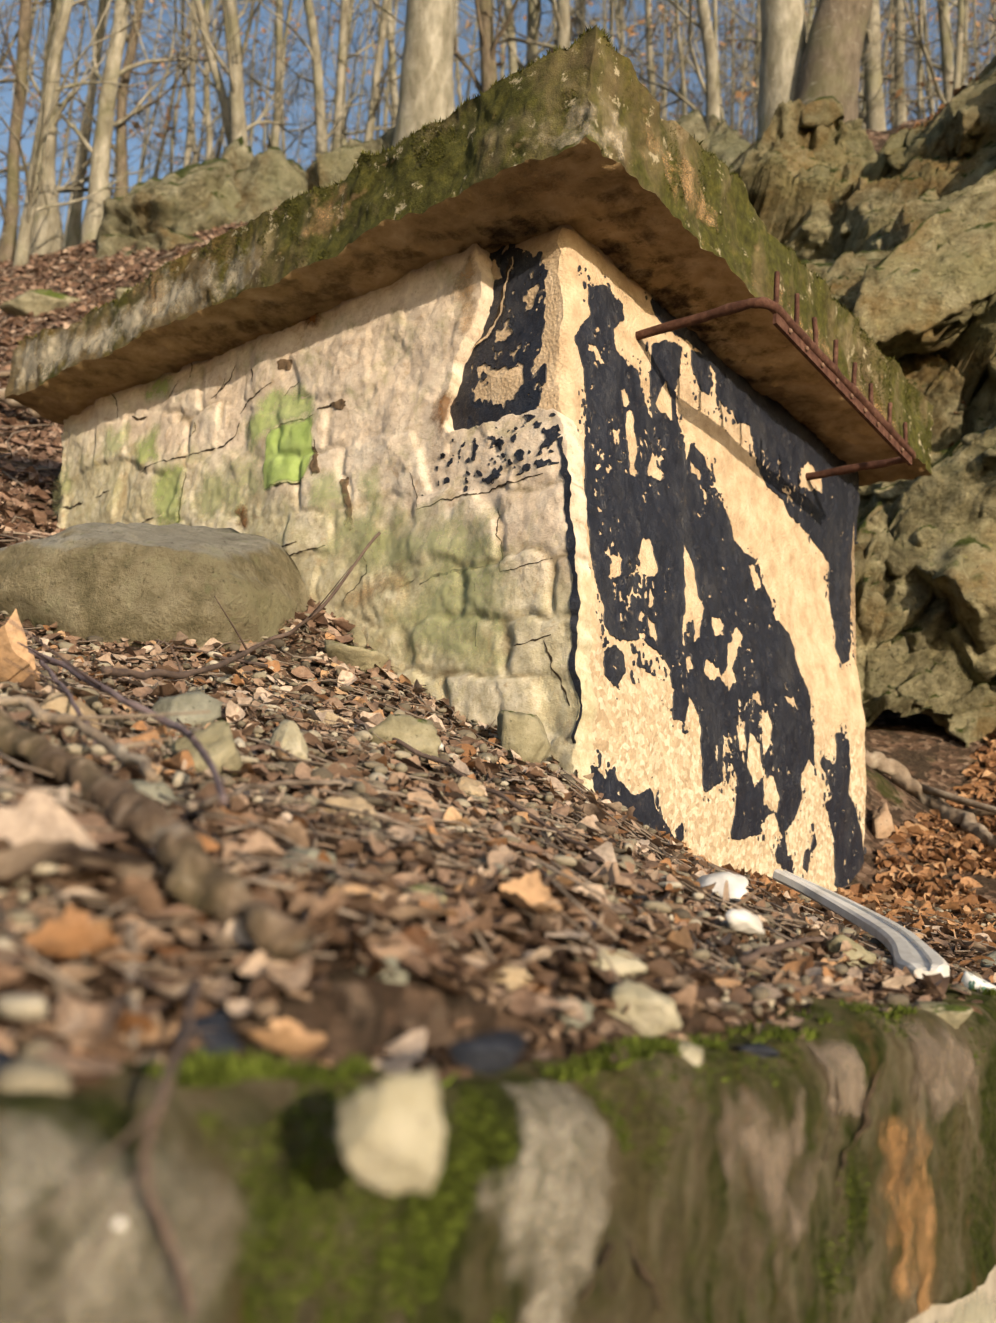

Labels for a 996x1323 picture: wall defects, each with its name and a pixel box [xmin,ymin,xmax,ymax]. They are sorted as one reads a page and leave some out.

crack [57,490,109,529]
crack [112,363,346,523]
damp [201,391,314,515]
crack [282,541,325,556]
crack [399,436,582,744]
peeling [435,244,561,492]
peeling [574,265,867,890]